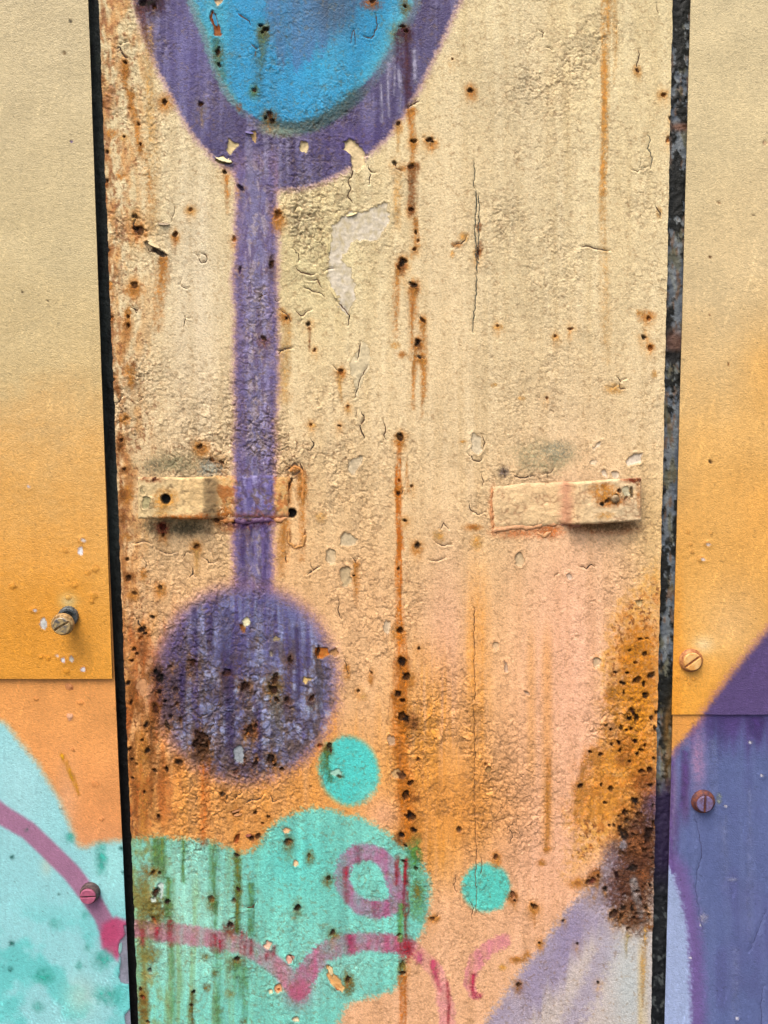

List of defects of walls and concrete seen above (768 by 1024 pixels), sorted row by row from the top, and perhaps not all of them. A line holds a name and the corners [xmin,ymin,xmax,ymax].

corrosion [600,0,617,221]
peeling [327,202,391,315]
corrosion [390,0,437,404]
crack [472,164,480,333]
corrosion [143,462,306,563]
peeling [326,532,358,587]
corrosion [126,634,183,832]
spalling [221,669,249,702]
peeling [234,745,244,763]
peeling [315,647,339,659]
corrosion [391,433,439,942]
corrosion [571,627,657,1002]